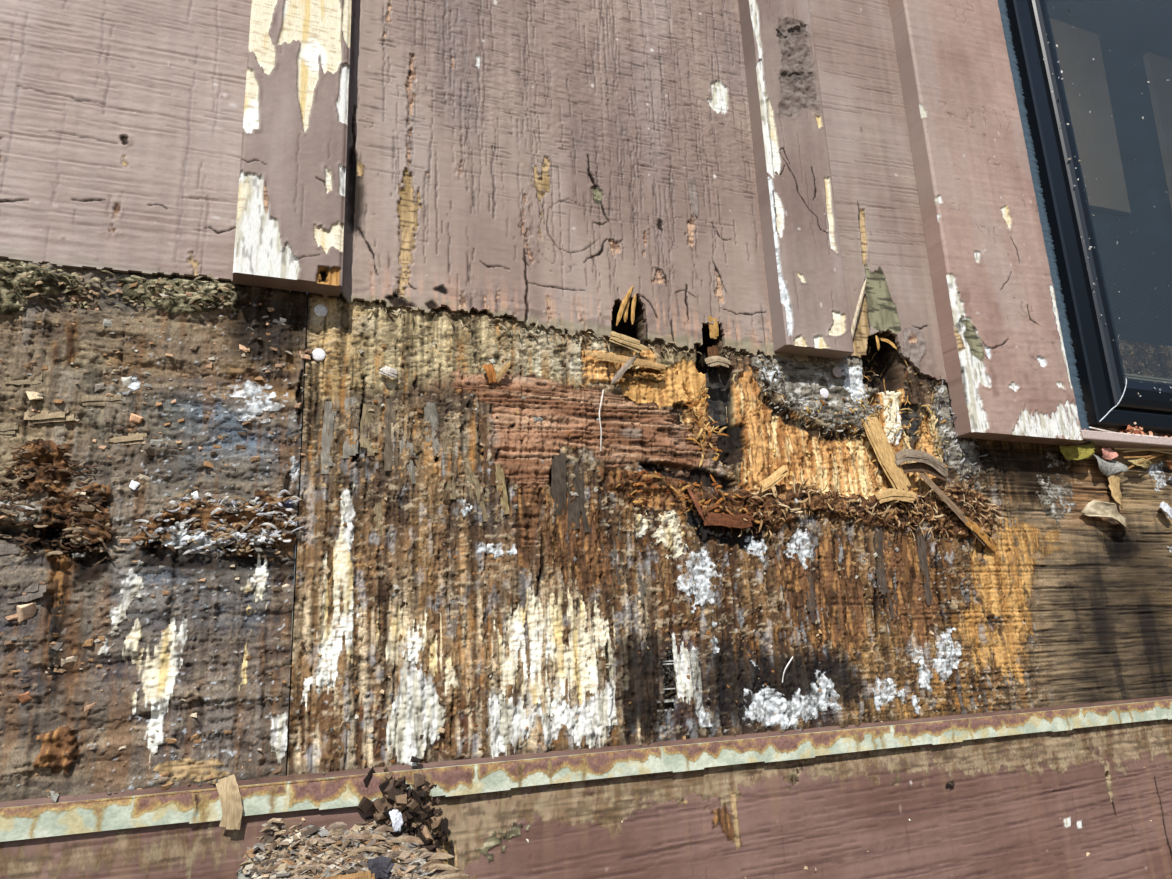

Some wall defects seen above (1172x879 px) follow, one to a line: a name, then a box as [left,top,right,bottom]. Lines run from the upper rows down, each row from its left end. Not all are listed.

peeling [243,0,351,134]
crack [0,197,27,205]
peeling [233,170,300,280]
crack [316,105,415,289]
crack [480,155,609,324]
crack [776,148,825,232]
spalling [685,274,1000,551]
peeling [1012,285,1081,440]
damp [1148,461,1172,492]
corrosion [0,788,220,837]
corrosion [238,700,1172,813]
corrosion [712,789,742,848]